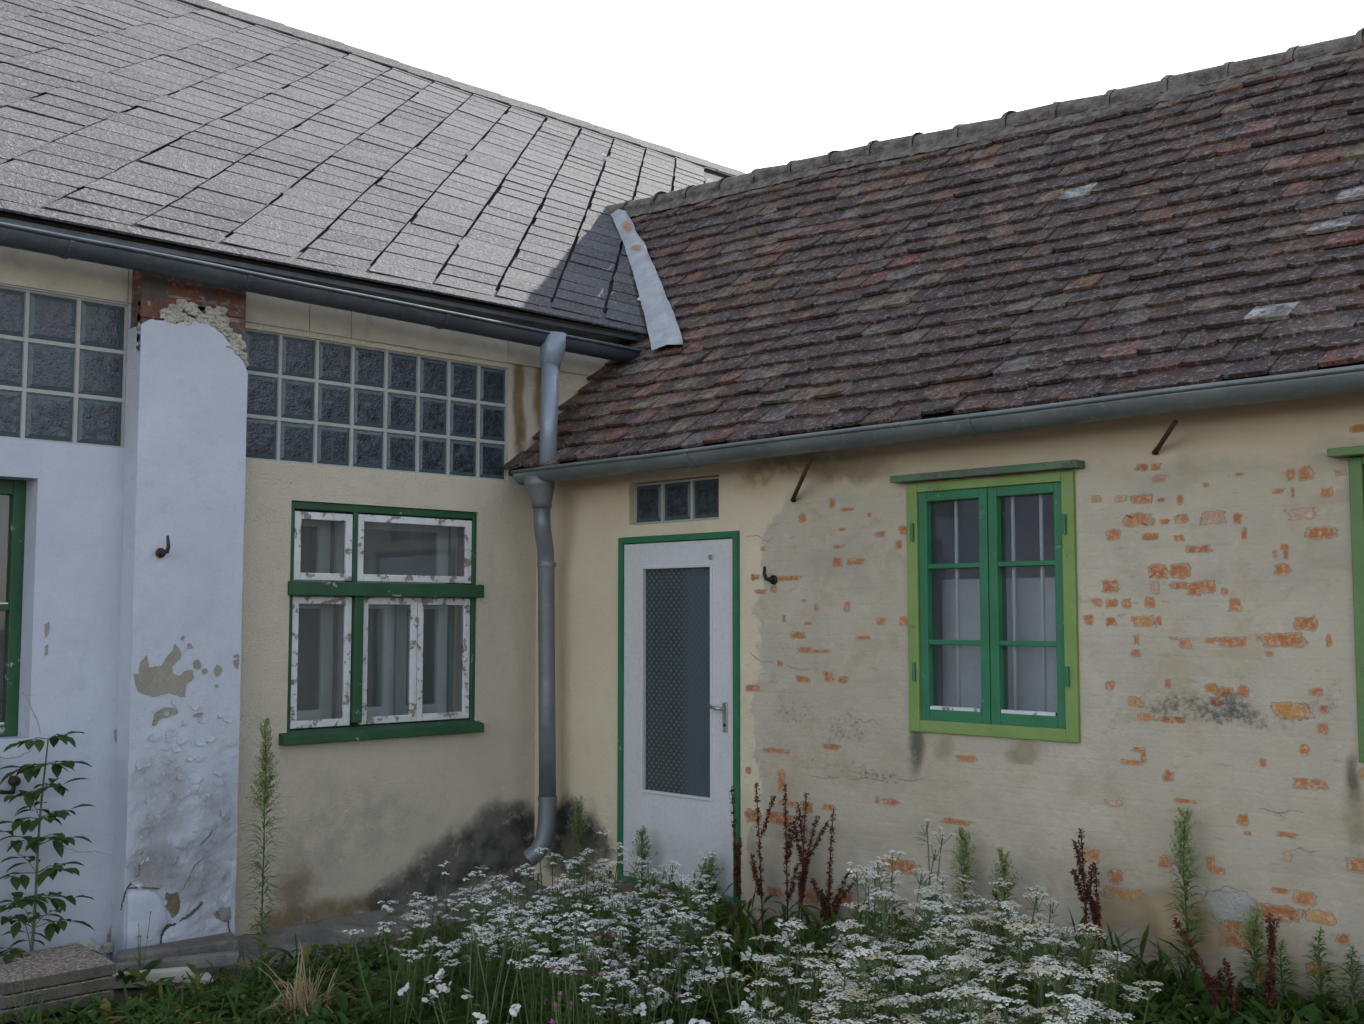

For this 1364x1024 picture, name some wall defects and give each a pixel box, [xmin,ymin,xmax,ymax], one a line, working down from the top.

flaking render [136,285,249,367]
spalling [1272,466,1346,540]
spalling [1083,463,1332,658]
flaking render [134,636,239,726]
spalling [1128,696,1185,723]
leakage [1152,694,1257,724]
spalling [1204,683,1249,707]
spalling [1271,688,1329,734]
leakage [366,804,535,912]
leakage [549,800,609,876]
flaking render [165,892,180,918]
spalling [1218,887,1351,984]